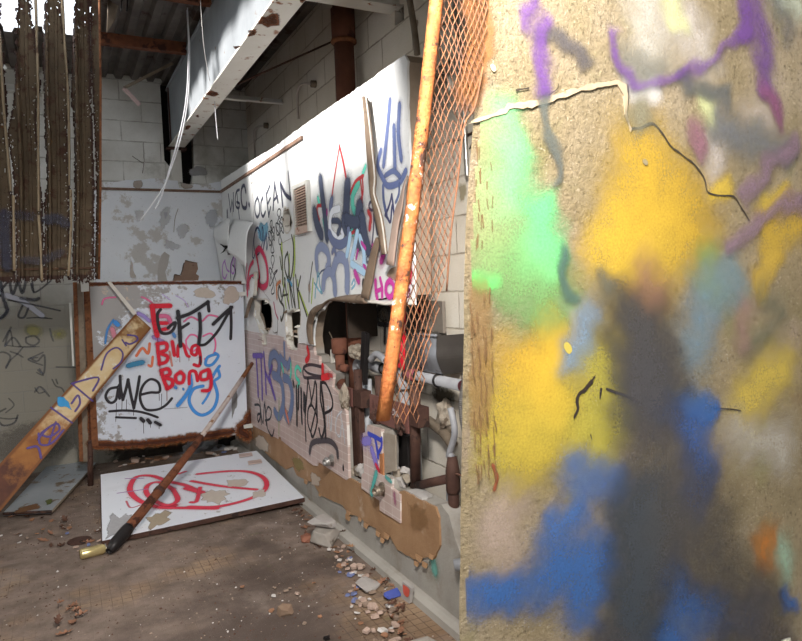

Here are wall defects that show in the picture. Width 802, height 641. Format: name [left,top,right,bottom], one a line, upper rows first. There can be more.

corrosion [247,13,280,37]
crack [627,84,750,221]
spalling [253,426,442,569]
peeling [106,513,131,538]
peeling [146,510,171,530]